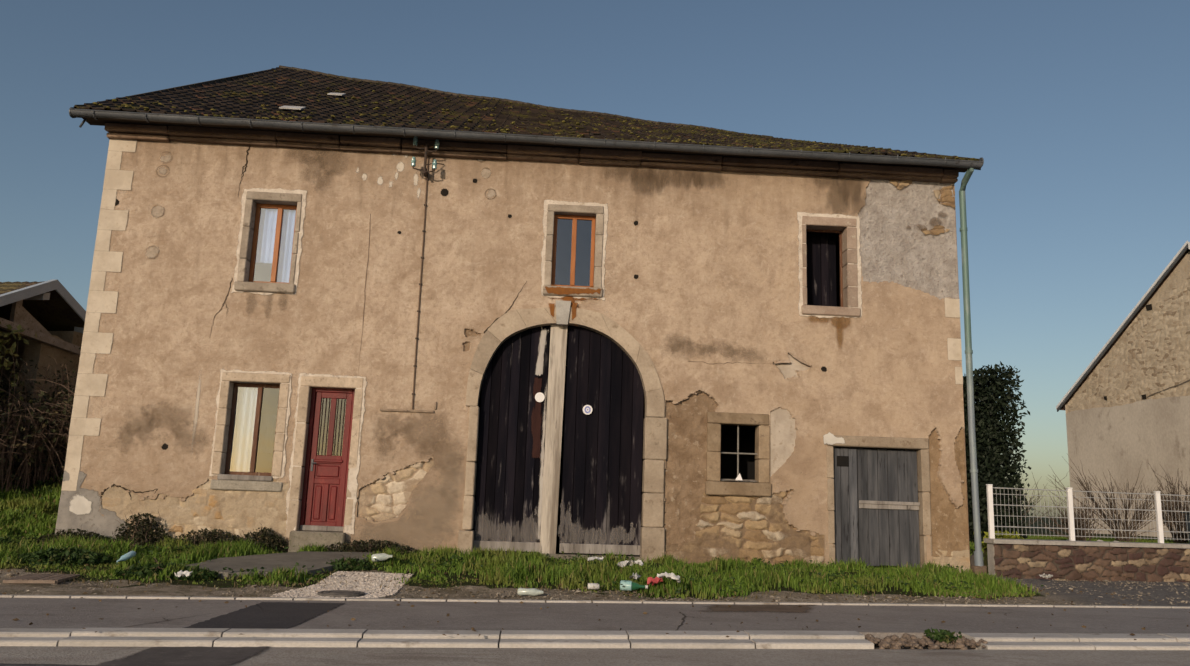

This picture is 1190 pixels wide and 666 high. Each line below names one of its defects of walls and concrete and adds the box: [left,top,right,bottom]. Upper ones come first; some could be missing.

crack [238,146,251,193]
flaking render [858,179,959,299]
crack [210,278,233,335]
crack [484,281,527,333]
flaking render [101,479,289,547]
flaking render [357,458,435,521]
flaking render [664,391,824,566]
flaking render [929,428,970,573]